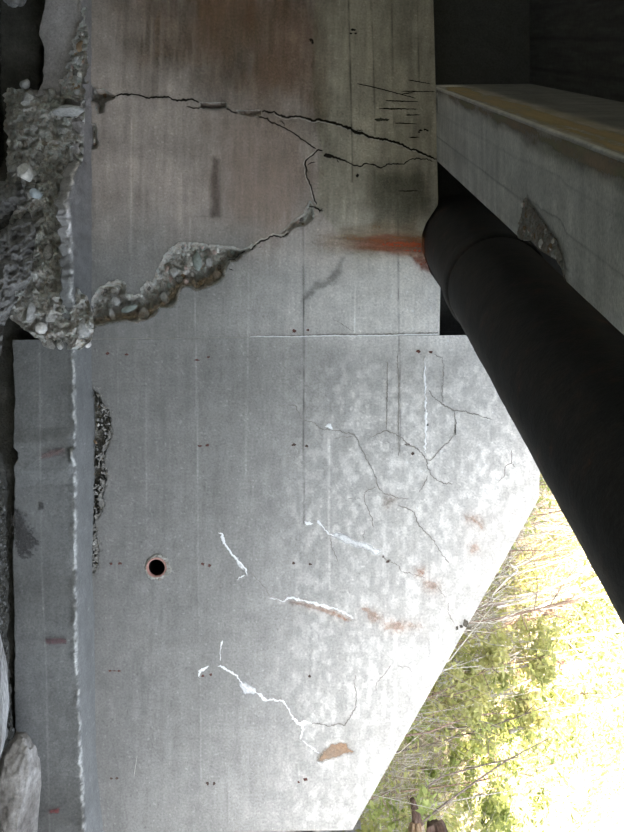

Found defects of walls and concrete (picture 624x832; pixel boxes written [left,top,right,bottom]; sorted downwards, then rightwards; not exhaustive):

crack [112,93,204,109]
spalling [2,6,258,350]
crack [258,110,436,213]
spalling [280,201,315,238]
corrosion [337,225,430,271]
spalling [517,197,565,281]
crack [252,320,492,563]
crack [383,557,453,621]
crack [312,665,413,727]